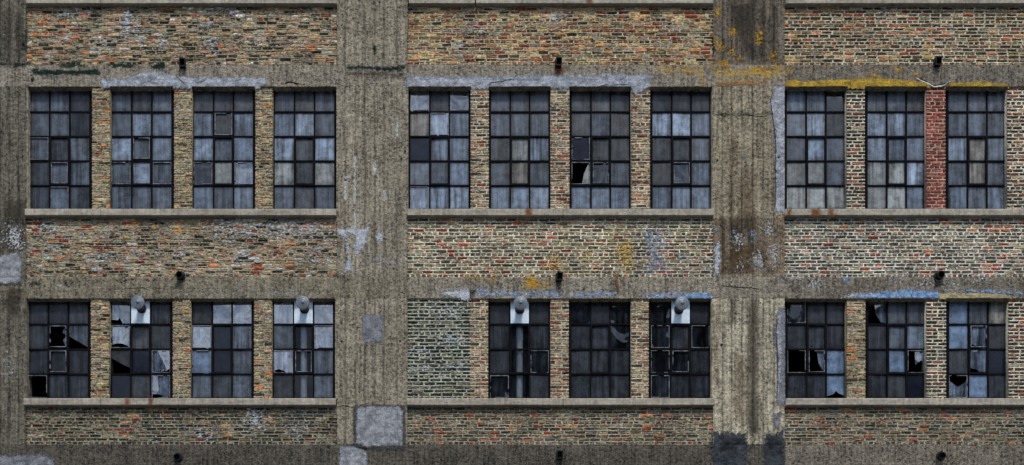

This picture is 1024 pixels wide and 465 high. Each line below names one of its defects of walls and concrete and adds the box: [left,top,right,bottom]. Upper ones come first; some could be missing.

damp [732,5,775,57]
peeling [337,227,403,273]
flaking render [884,272,1012,299]